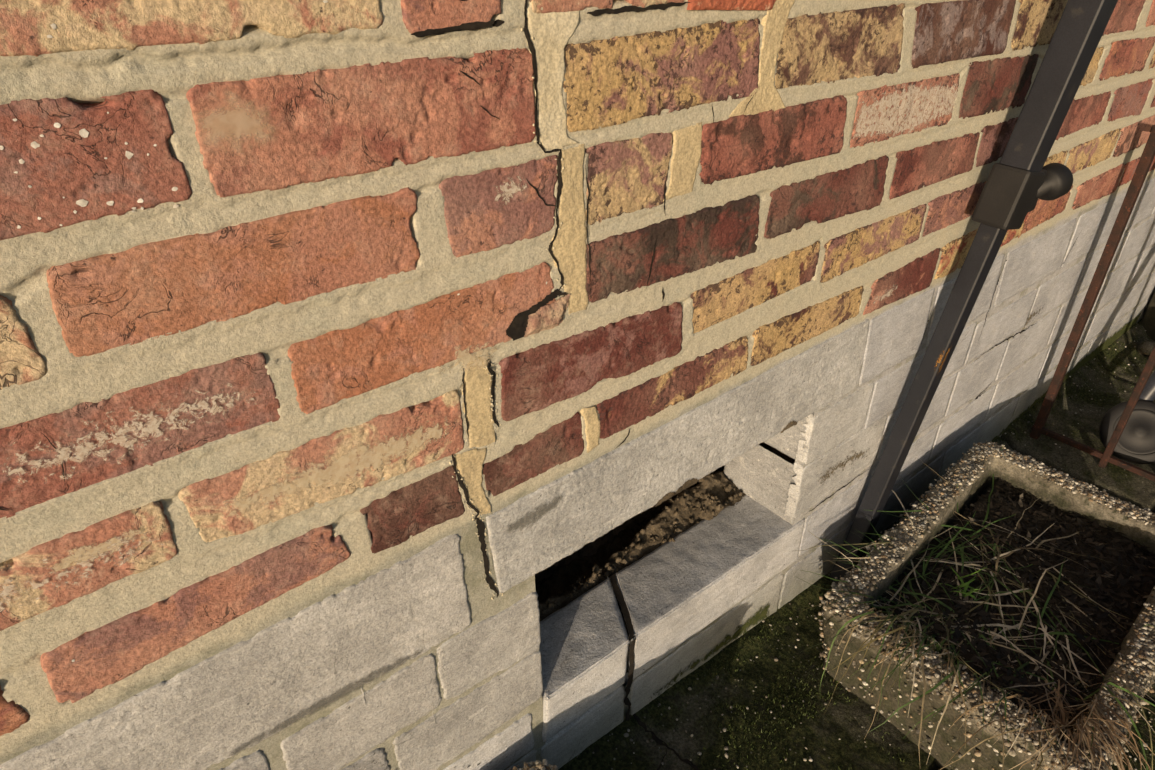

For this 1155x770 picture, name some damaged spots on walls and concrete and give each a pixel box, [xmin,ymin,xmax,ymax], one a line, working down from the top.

crack [459,70,501,120]
crack [521,0,591,293]
spalling [506,289,570,341]
water stain [3,383,255,483]
crack [449,354,503,600]
spalling [758,442,795,465]
spalling [535,478,700,585]
crack [610,574,699,770]